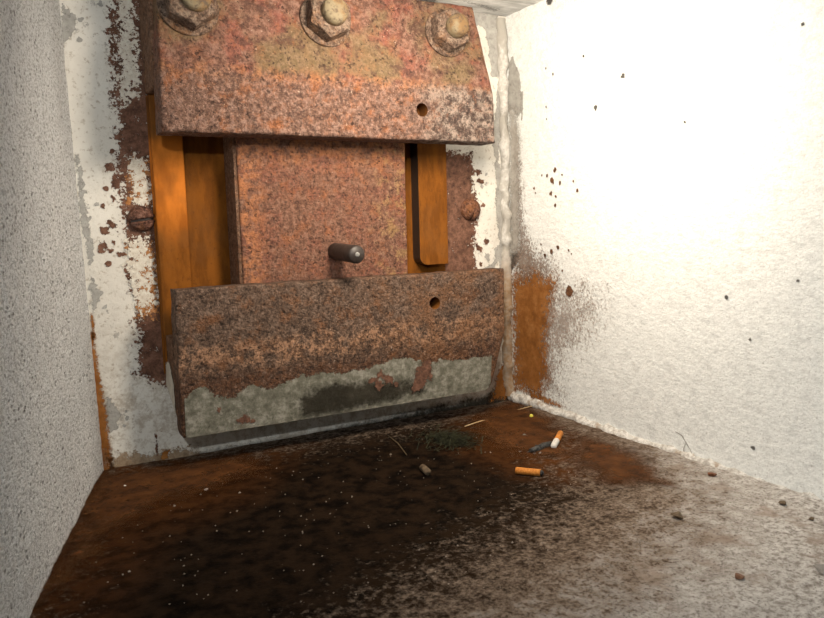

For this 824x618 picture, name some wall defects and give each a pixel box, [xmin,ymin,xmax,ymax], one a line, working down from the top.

peeling [61,3,84,46]
peeling [74,0,167,389]
corrosion [511,243,585,408]
leakage [538,285,600,403]
peeling [104,397,129,433]
leakage [341,362,508,427]
corrosion [469,402,669,486]